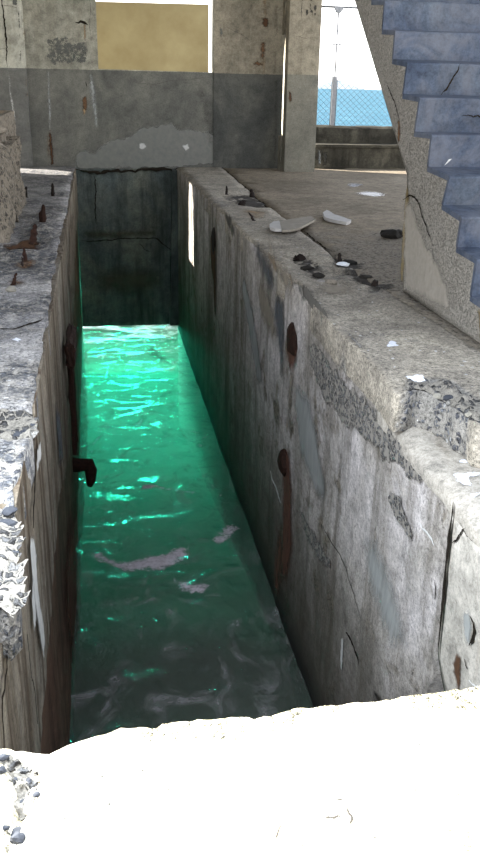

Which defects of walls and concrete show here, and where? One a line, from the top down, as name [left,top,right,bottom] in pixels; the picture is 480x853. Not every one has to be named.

crack [1,0,16,62]
rust [3,239,39,250]
spalling [0,408,39,441]
spalling [401,374,480,423]
spalling [0,506,31,617]
rust [274,452,292,590]
crack [434,505,472,649]
crack [1,655,9,748]